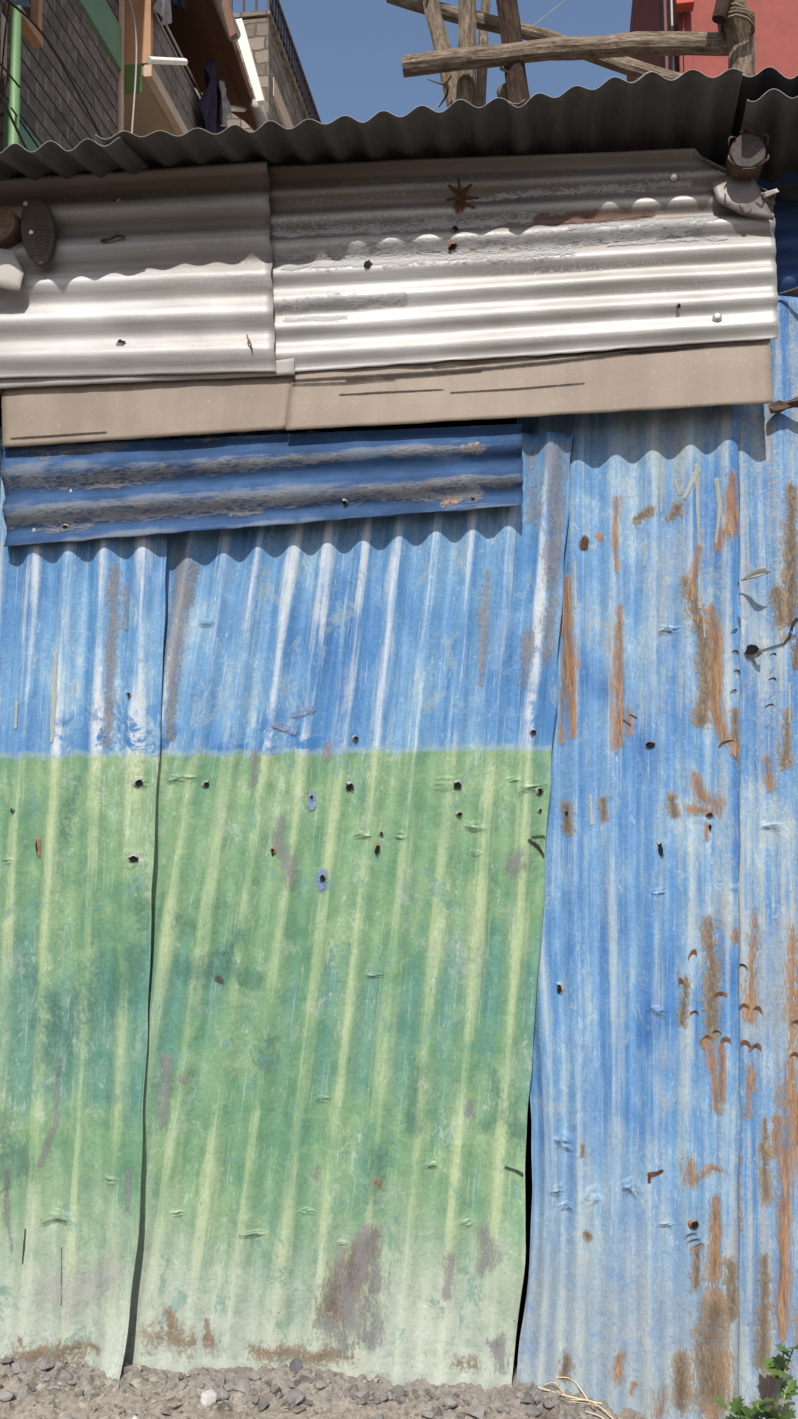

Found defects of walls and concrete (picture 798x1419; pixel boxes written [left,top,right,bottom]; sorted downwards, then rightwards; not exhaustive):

corrosion [534,207,656,225]
corrosion [606,605,634,753]
corrosion [579,495,688,573]
corrosion [678,468,740,766]
corrosion [763,707,794,792]
corrosion [768,481,798,669]
corrosion [609,905,798,1419]